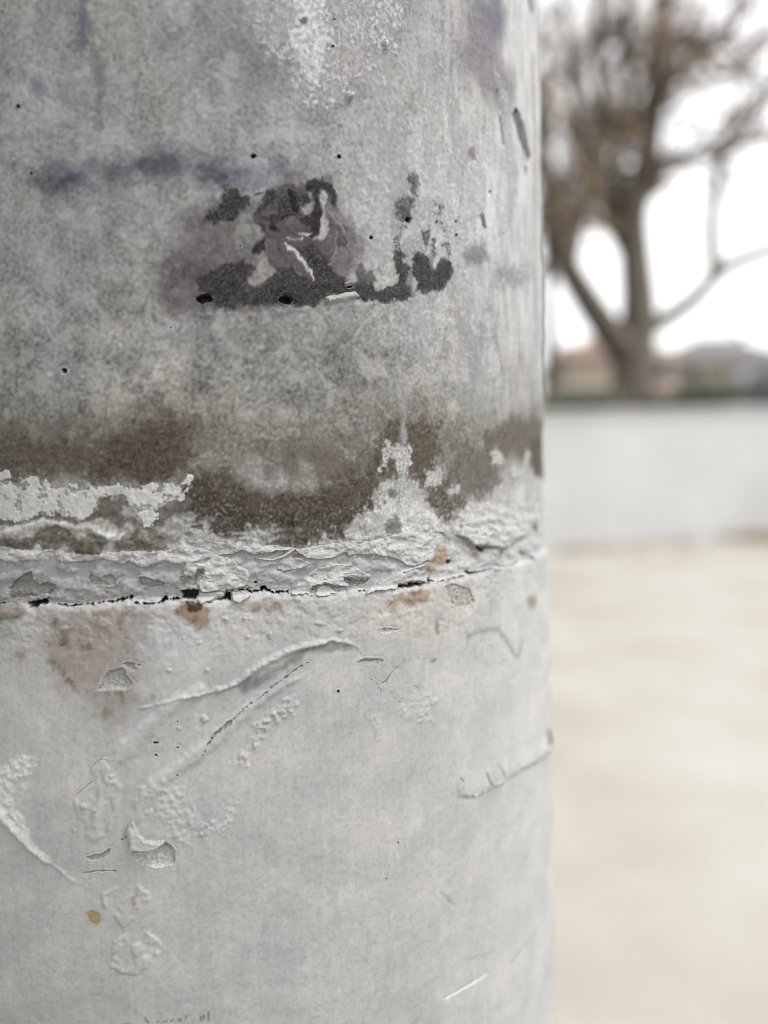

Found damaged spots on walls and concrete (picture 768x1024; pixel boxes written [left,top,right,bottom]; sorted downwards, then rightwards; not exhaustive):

damp [0,0,544,560]
rust [175,601,208,629]
crack [0,531,537,611]
peeling [0,515,539,605]
spalling [442,581,477,611]
spalling [94,659,145,694]
peeling [82,774,243,876]